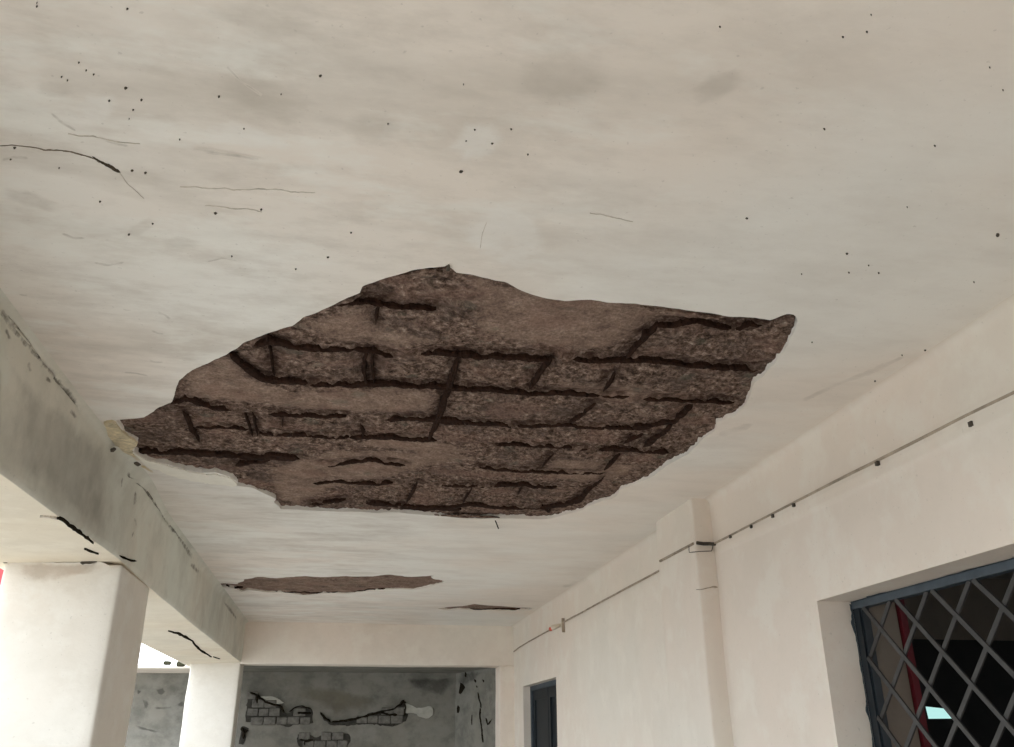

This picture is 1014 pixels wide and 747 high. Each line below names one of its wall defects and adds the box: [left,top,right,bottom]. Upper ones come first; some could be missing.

crack [0,134,144,199]
crack [183,186,315,212]
flaking render [104,264,795,518]
crack [40,515,136,565]
flaking render [221,575,442,595]
crack [168,630,220,659]
flaking render [239,691,408,747]